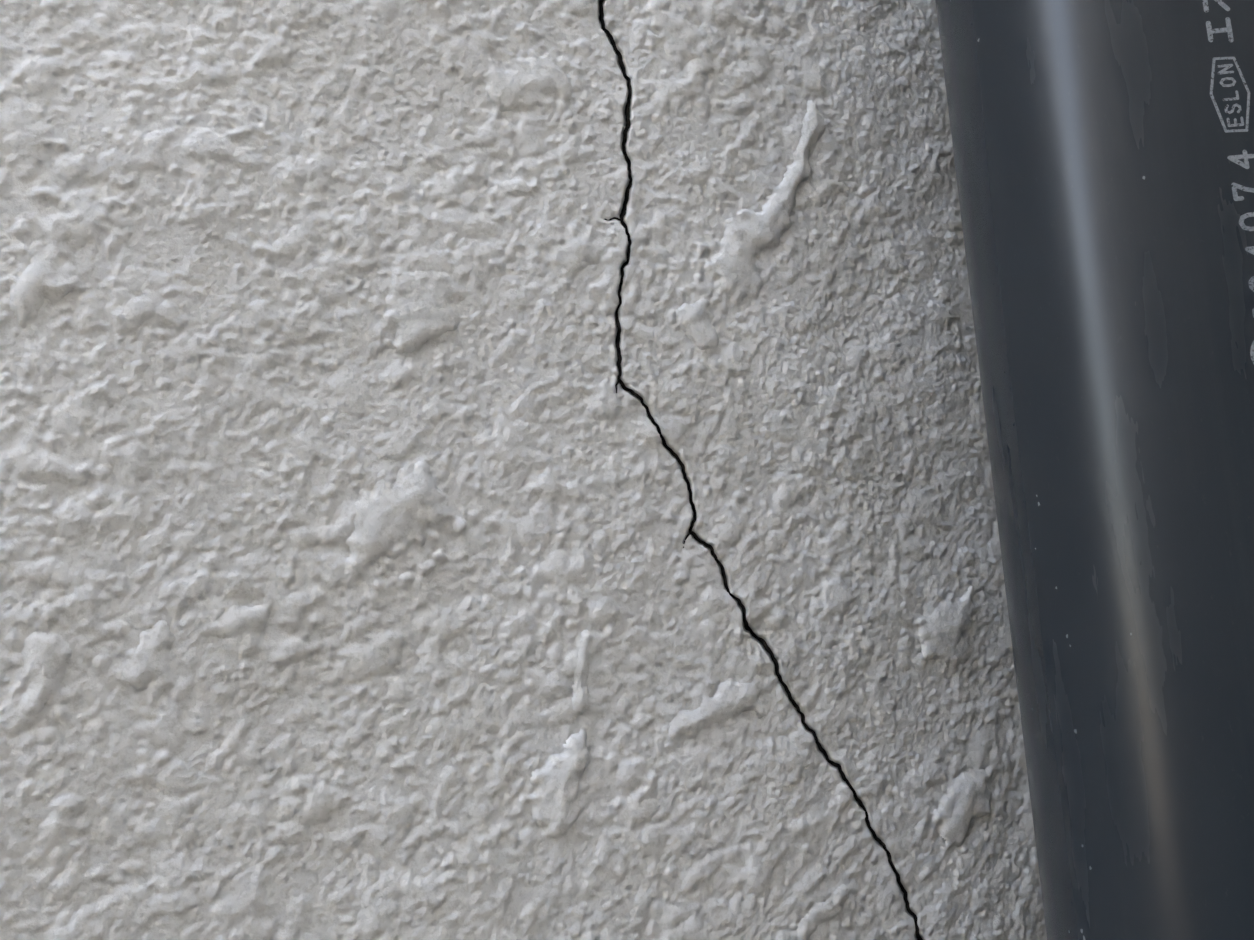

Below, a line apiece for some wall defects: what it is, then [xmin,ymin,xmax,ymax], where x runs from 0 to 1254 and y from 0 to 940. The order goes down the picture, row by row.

crack [599,0,923,940]